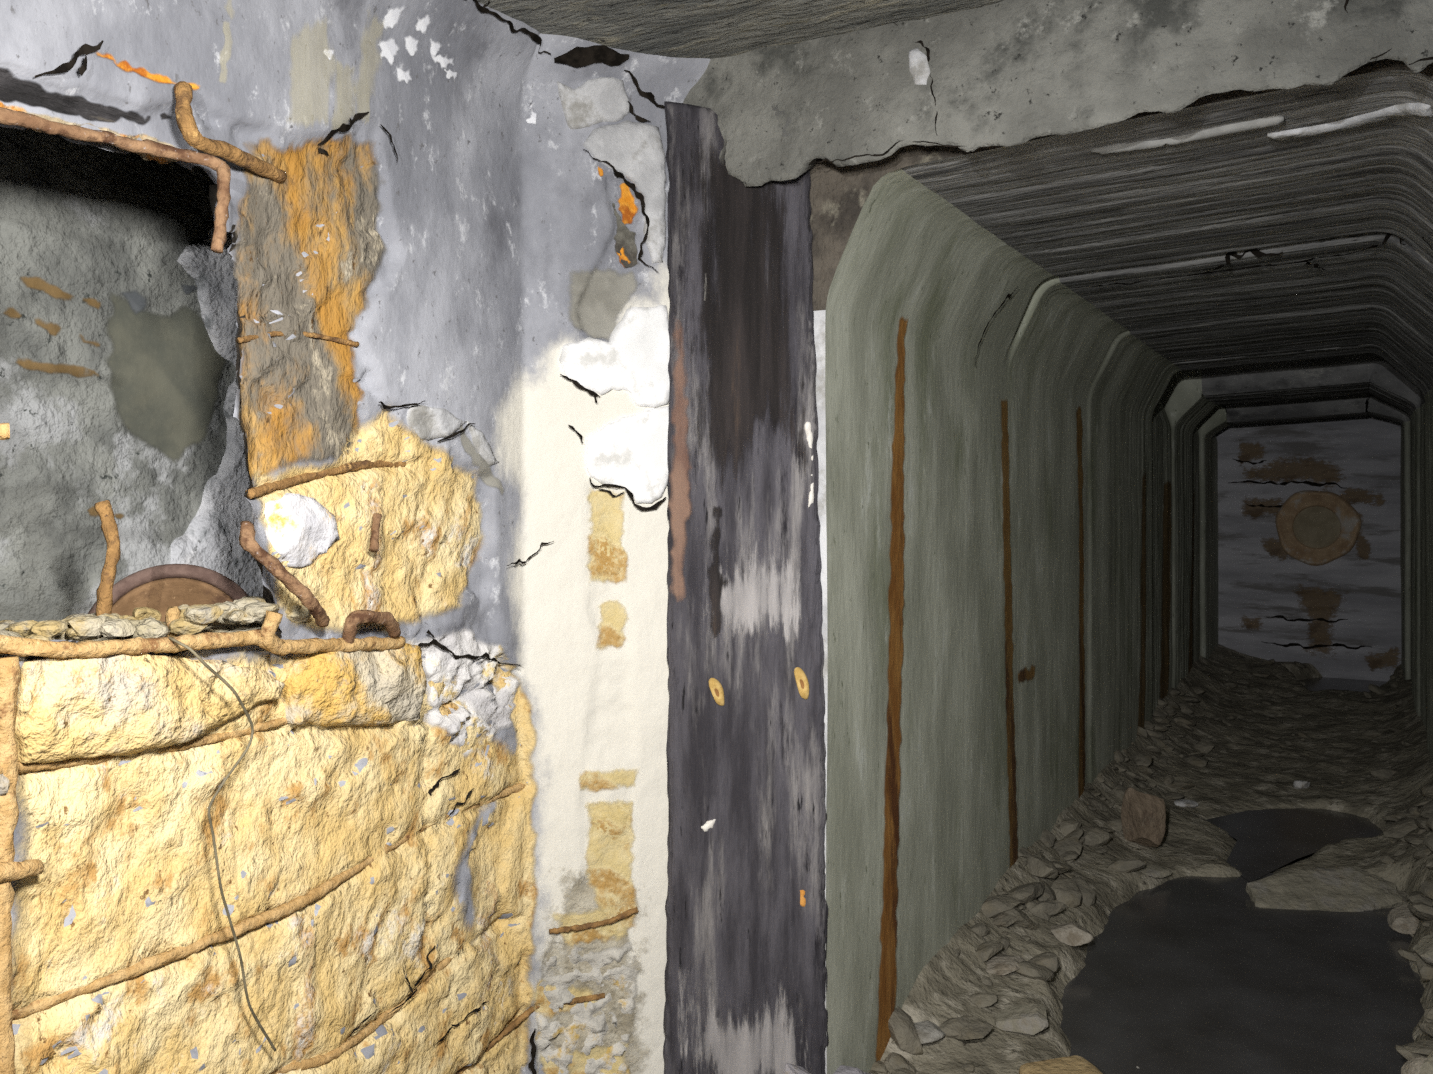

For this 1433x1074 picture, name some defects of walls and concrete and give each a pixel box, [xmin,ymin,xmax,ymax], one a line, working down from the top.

peeling [557,77,667,268]
crack [811,23,960,163]
peeling [1090,103,1433,154]
peeling [0,68,526,1074]
rust [233,134,482,631]
crack [560,374,600,443]
peeling [559,305,670,503]
crack [589,478,666,511]
damp [708,507,728,637]
damp [690,146,806,485]
rust [876,317,908,1061]
rust [11,655,636,1074]